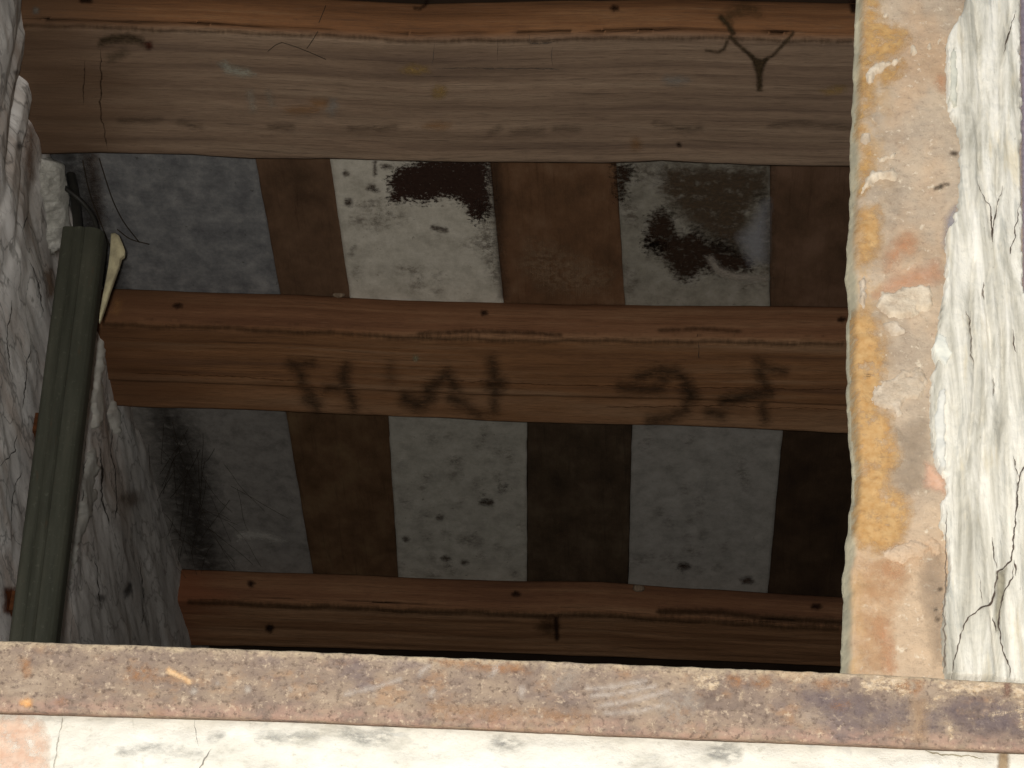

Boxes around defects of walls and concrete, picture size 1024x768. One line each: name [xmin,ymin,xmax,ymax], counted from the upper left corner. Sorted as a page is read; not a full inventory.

leakage [367,161,498,239]
leakage [610,163,771,284]
crack [978,185,1021,254]
crack [942,457,1024,679]